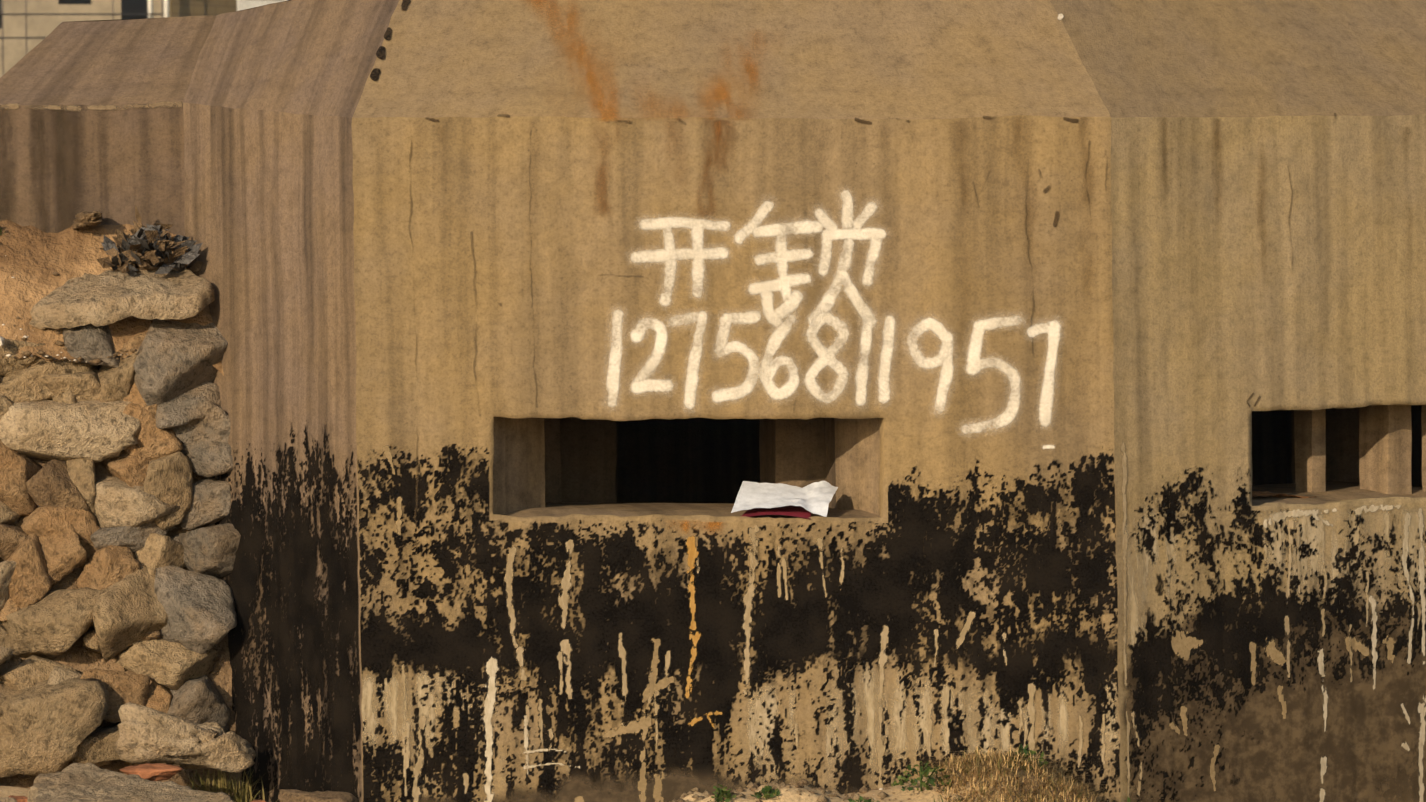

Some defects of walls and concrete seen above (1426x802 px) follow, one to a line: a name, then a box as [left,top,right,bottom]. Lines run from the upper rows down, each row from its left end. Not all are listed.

leakage [212,426,1426,802]